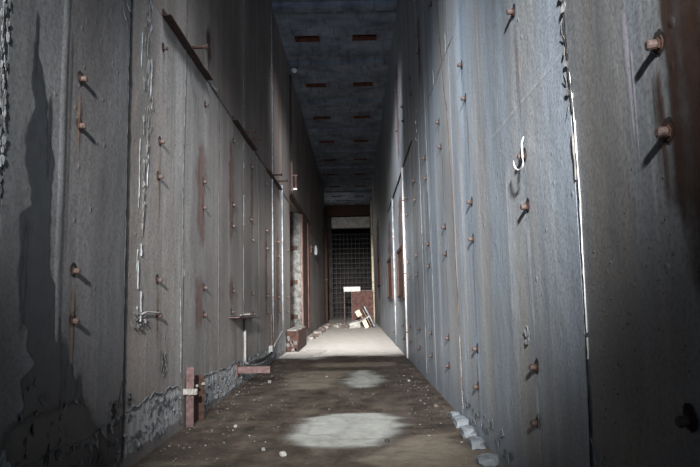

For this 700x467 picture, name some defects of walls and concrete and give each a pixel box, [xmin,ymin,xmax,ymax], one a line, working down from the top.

peeling [0,0,11,196]
peeling [205,342,282,406]
peeling [110,385,182,453]